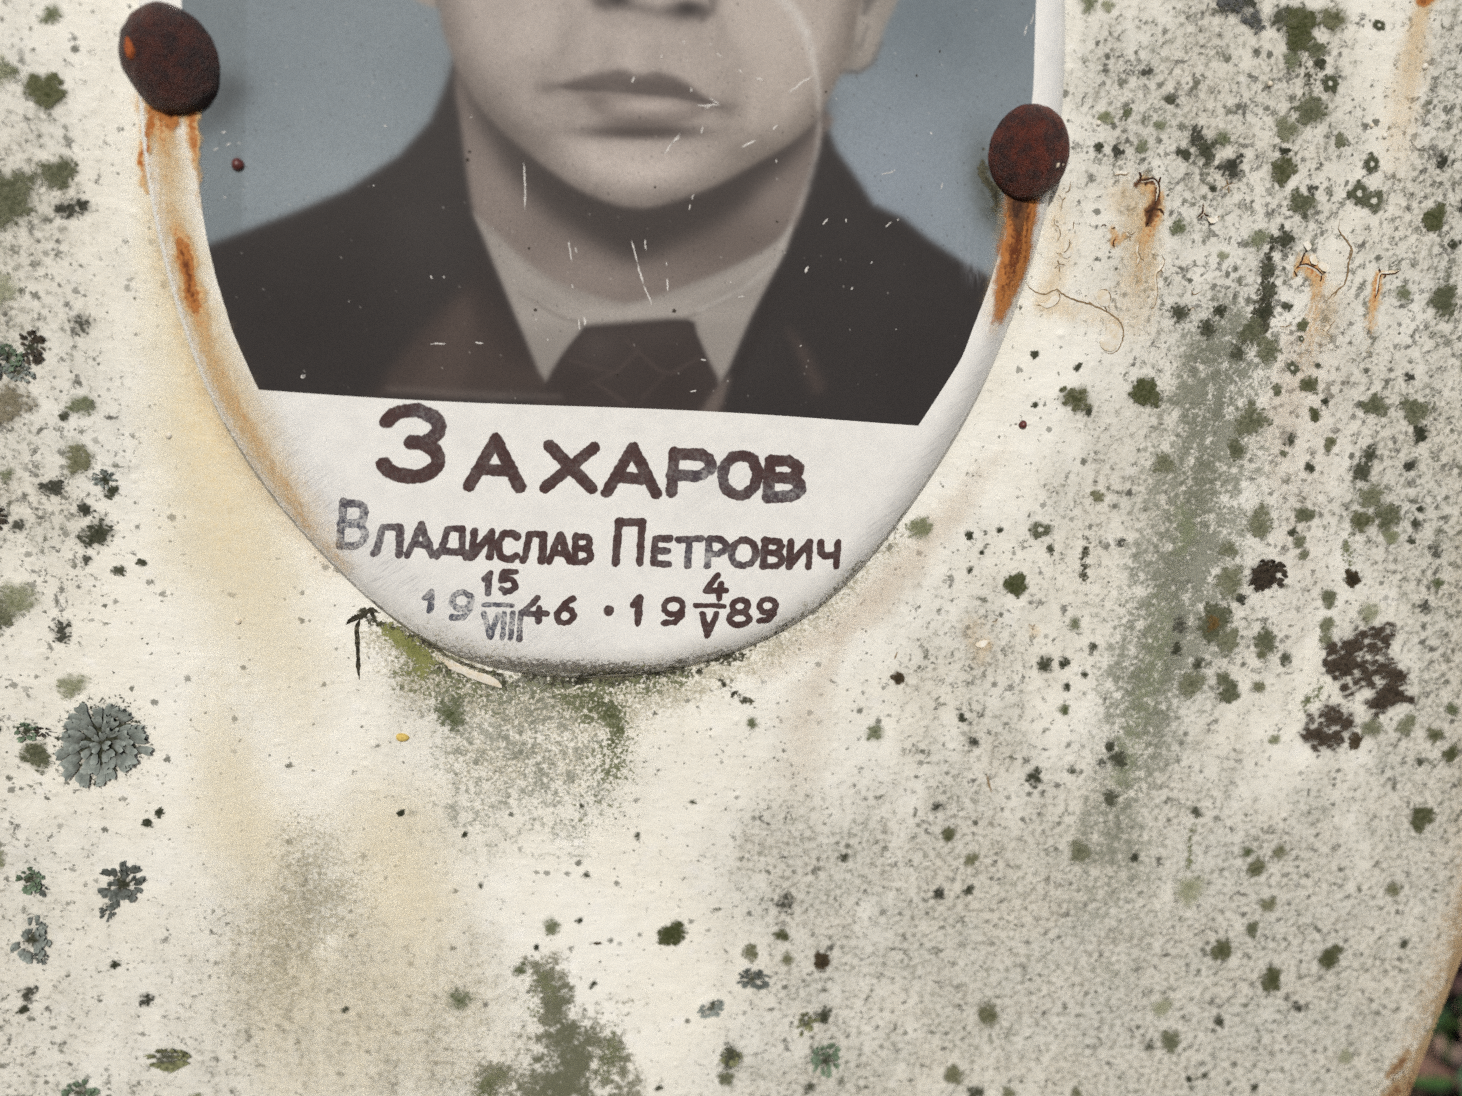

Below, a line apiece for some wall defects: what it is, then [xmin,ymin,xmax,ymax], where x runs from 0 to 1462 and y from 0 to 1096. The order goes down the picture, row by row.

corrosion [124,36,135,60]
corrosion [1410,0,1434,58]
corrosion [1110,177,1164,267]
corrosion [994,196,1040,323]
corrosion [136,99,309,527]
corrosion [1293,255,1325,330]
damp [520,964,561,1028]
damp [471,1065,507,1096]
damp [592,1025,626,1085]